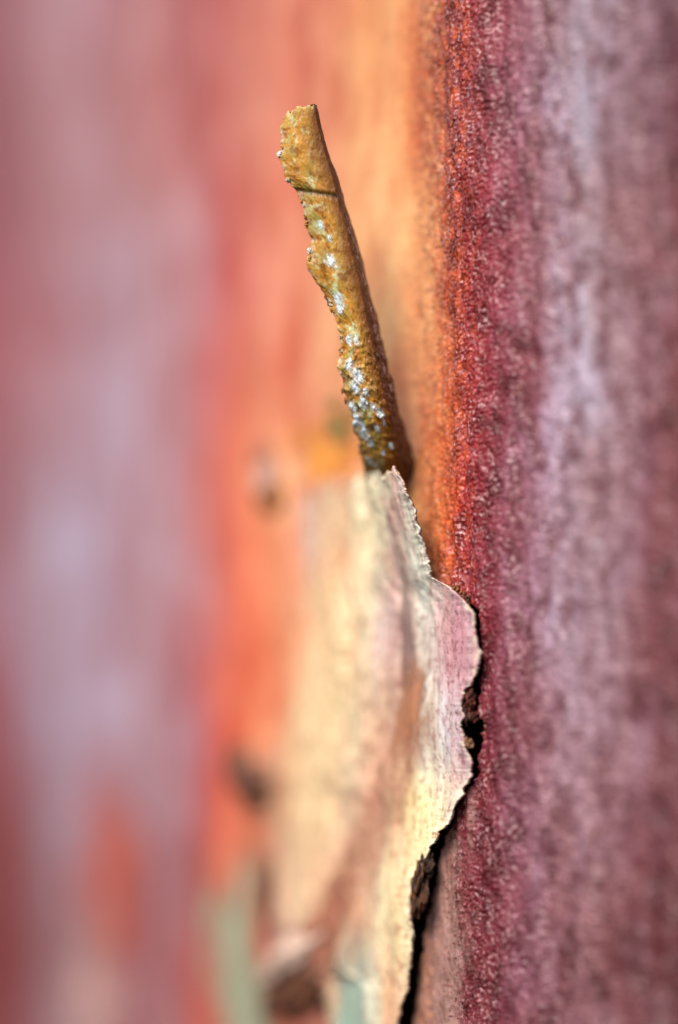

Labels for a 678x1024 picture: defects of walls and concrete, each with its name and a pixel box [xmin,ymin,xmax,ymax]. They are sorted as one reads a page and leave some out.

peeling [448,584,471,606]
peeling [462,687,479,749]
peeling [258,855,327,1023]
peeling [410,838,462,1024]